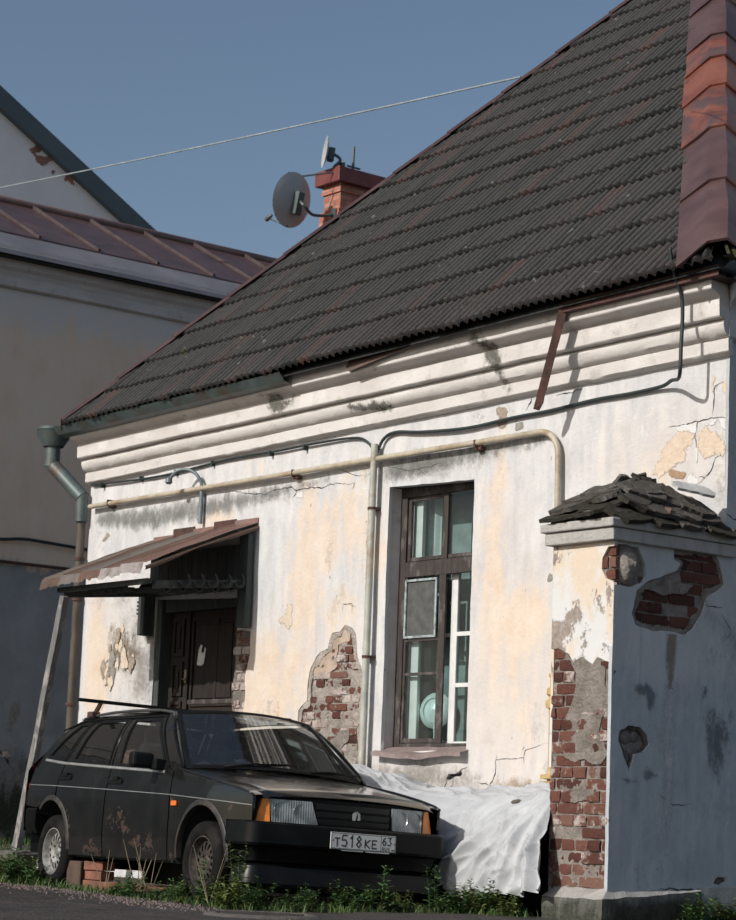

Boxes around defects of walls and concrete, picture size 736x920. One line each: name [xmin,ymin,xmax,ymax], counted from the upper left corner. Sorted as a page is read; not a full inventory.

water stain [469,332,510,391]
crack [671,382,726,440]
peeling [653,418,726,484]
water stain [98,487,288,526]
crack [216,469,362,502]
spalling [603,544,723,635]
peeling [100,623,135,691]
spalling [297,625,362,764]
crack [444,746,537,787]
spalling [548,649,616,889]
spalling [618,726,648,768]